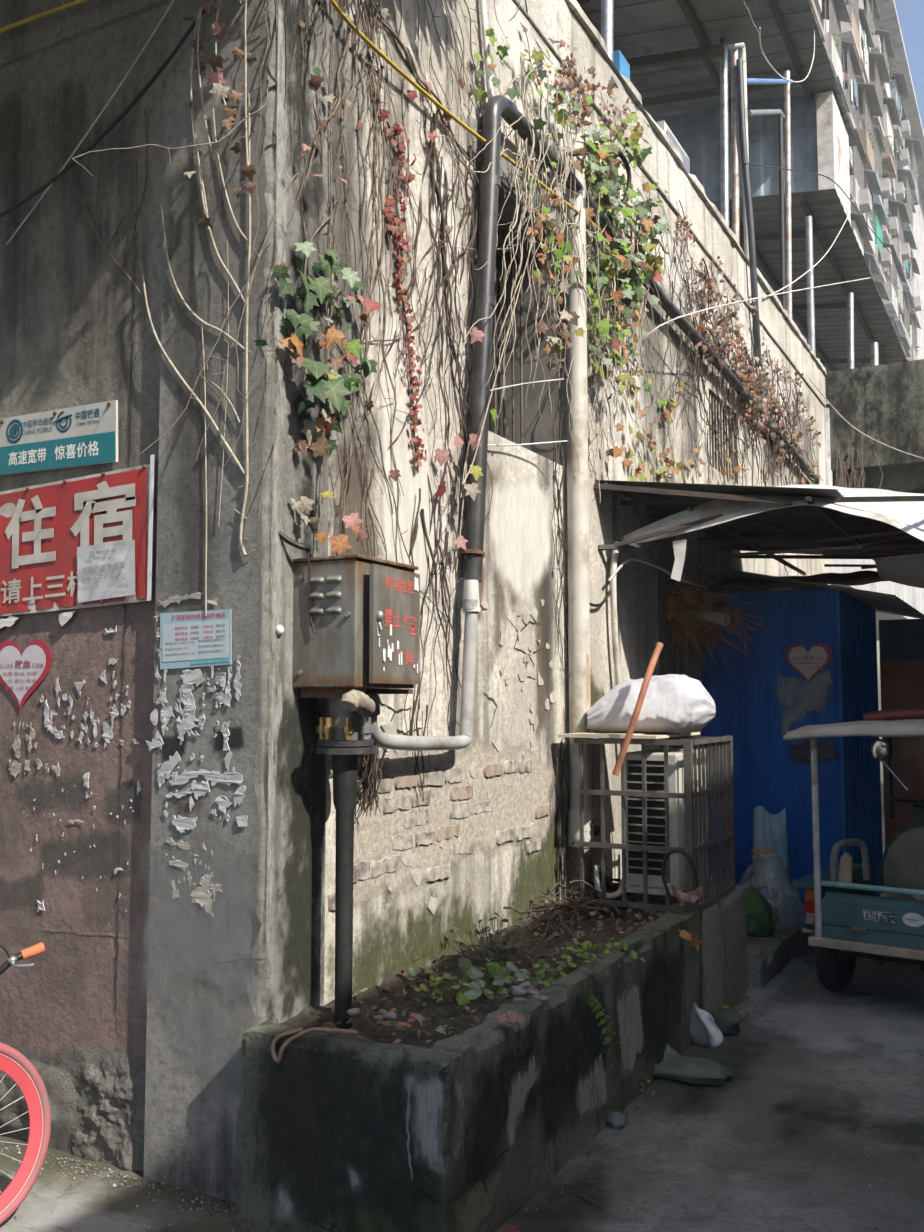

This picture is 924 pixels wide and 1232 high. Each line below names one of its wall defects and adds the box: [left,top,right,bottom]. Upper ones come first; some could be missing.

crack [128,152,139,468]
peeling [379,293,464,606]
peeling [422,143,463,334]
crack [7,604,141,1030]
spalling [353,476,557,915]